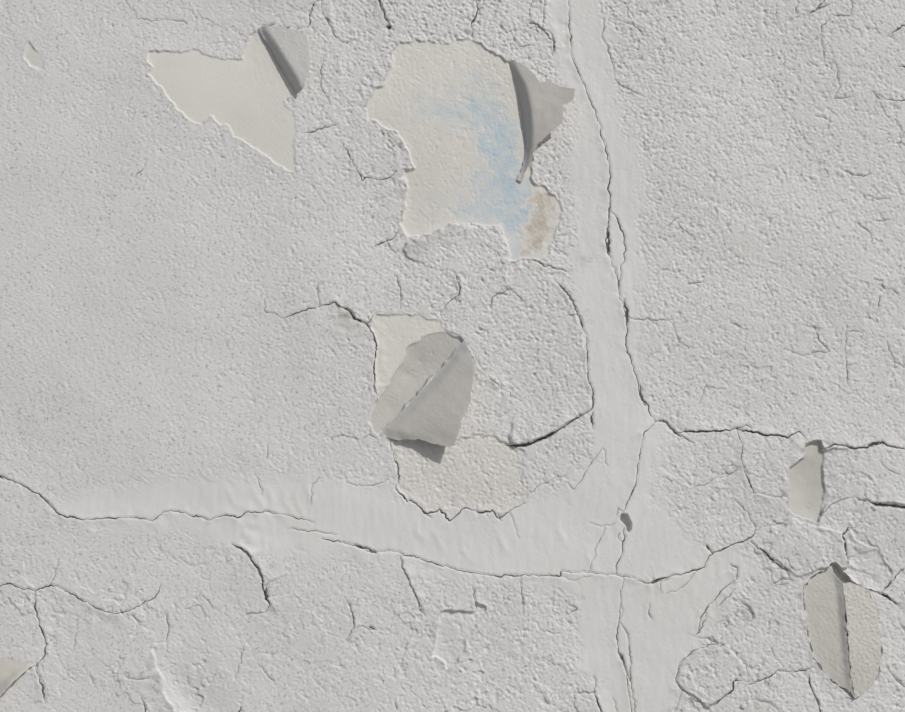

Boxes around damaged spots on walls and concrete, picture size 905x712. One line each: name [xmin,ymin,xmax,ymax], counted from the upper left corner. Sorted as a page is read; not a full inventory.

peeling [146,25,310,172]
peeling [366,38,575,262]
crack [0,476,310,521]
crack [264,286,378,399]
peeling [368,313,529,513]
crack [287,0,821,712]
flaking render [788,440,826,524]
crack [827,442,903,475]
crack [0,559,214,699]
flaking render [151,619,252,712]
crack [232,544,270,614]
peeling [801,528,893,699]